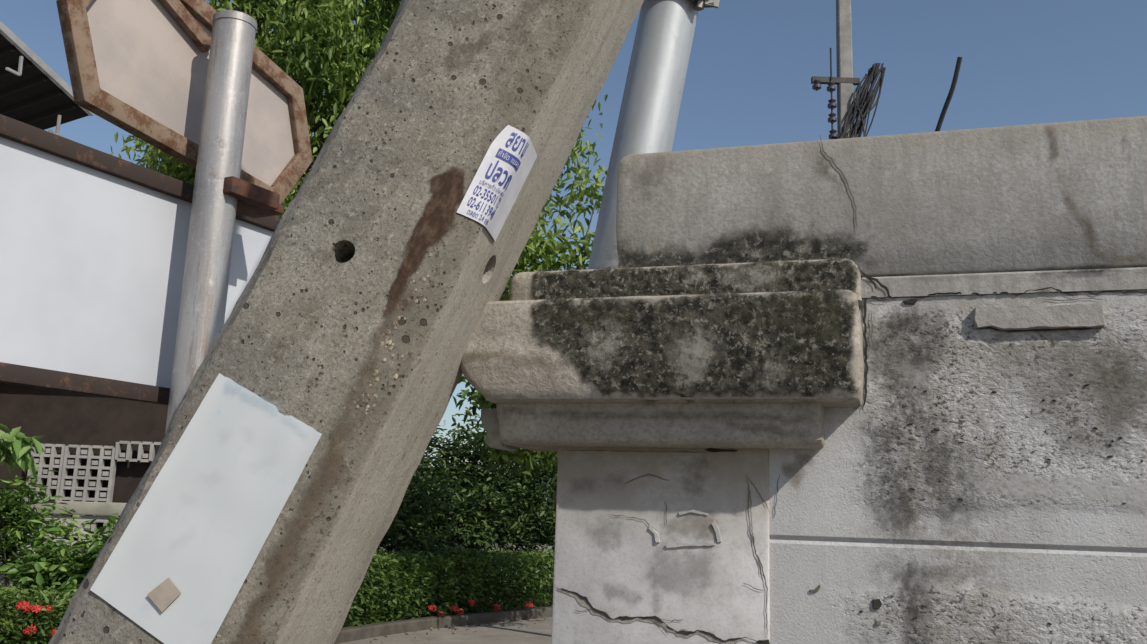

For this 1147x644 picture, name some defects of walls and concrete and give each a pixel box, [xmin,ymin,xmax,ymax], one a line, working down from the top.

crack [819,135,857,230]
corrosion [384,167,465,315]
damp [616,229,868,268]
crack [570,448,738,530]
crack [555,475,780,644]